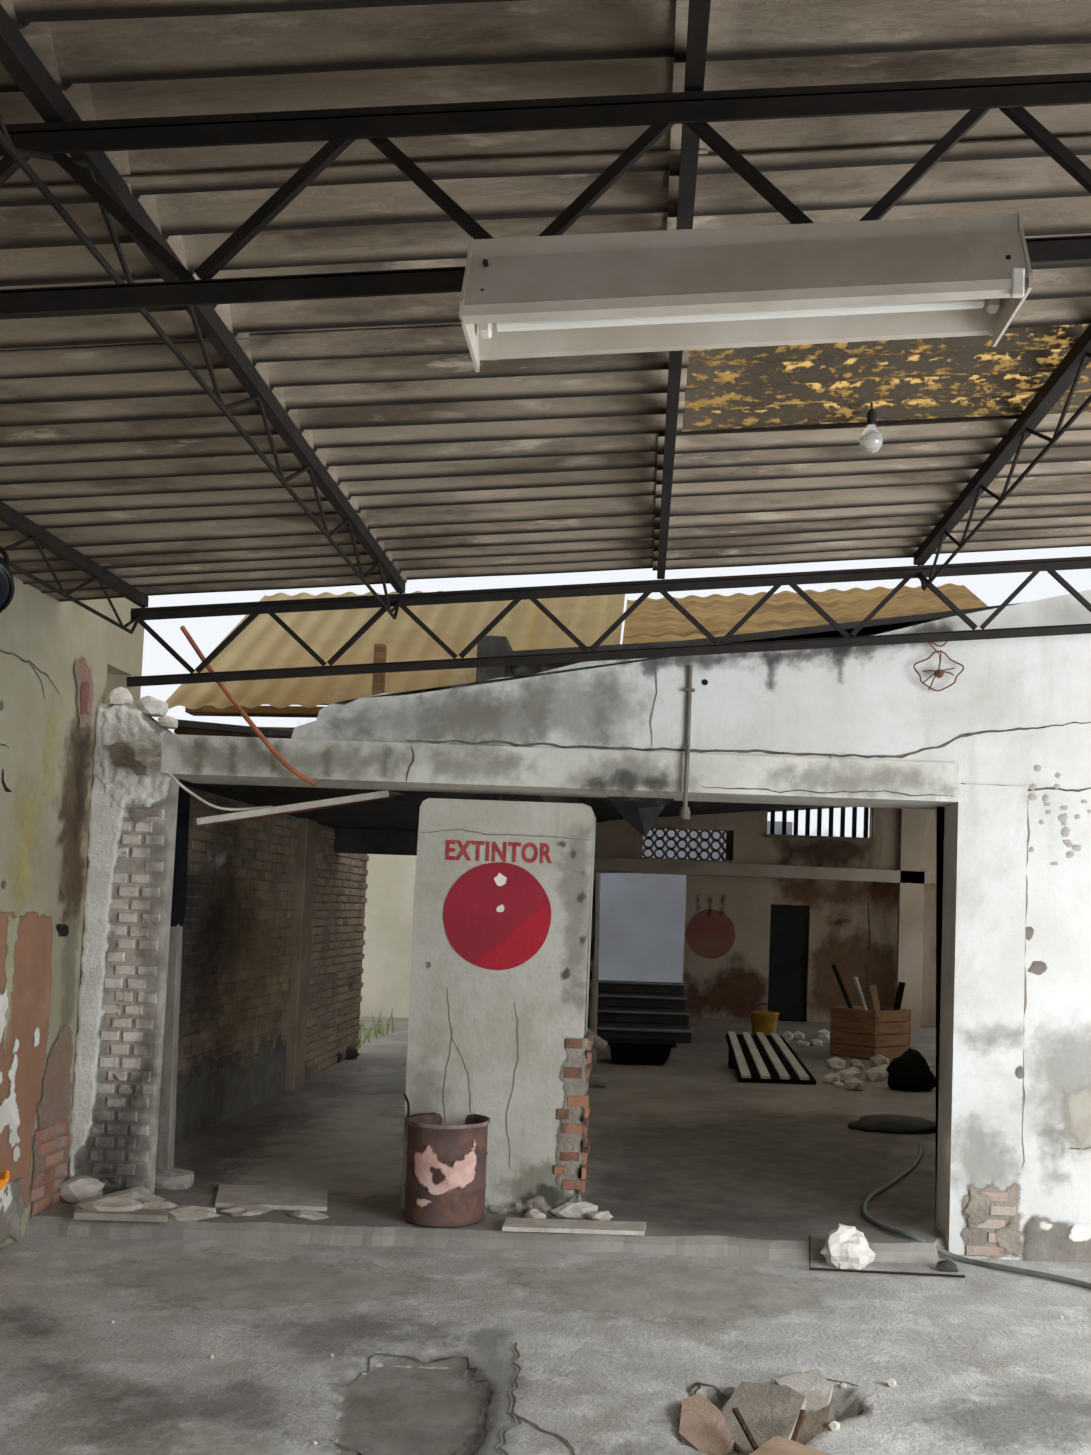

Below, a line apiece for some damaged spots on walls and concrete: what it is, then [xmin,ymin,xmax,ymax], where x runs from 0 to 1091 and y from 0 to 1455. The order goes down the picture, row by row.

crack [0,649,60,700]
crack [406,661,1091,797]
spalling [57,924,69,937]
flaking render [74,658,178,1188]
crack [865,900,873,944]
crack [1000,785,1091,1168]
flaking render [0,988,73,1250]
crack [506,1003,519,1170]
flaking render [488,1034,593,1216]
flaking render [961,1183,1023,1259]
crack [330,1342,576,1455]
crack [678,1382,717,1410]